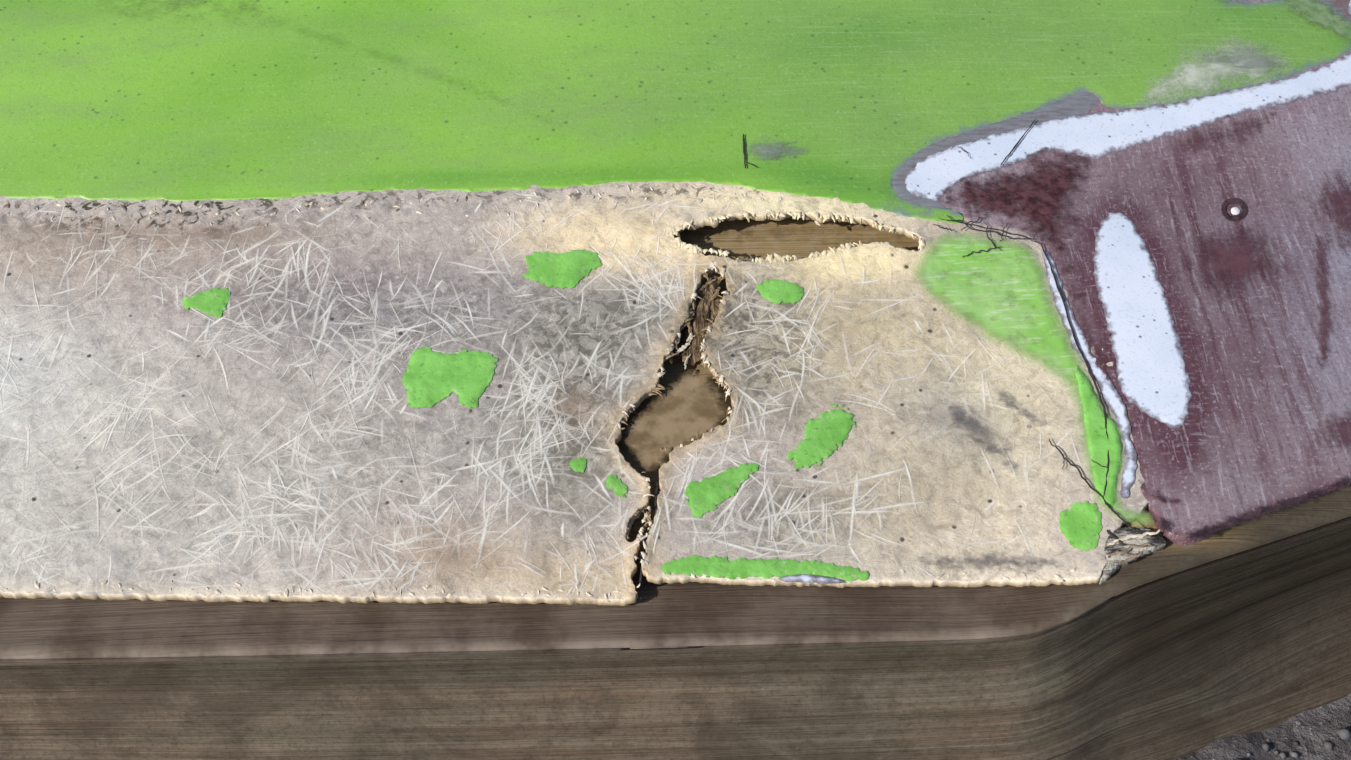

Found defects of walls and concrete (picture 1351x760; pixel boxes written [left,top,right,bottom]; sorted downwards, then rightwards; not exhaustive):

crack [618,260,732,599]